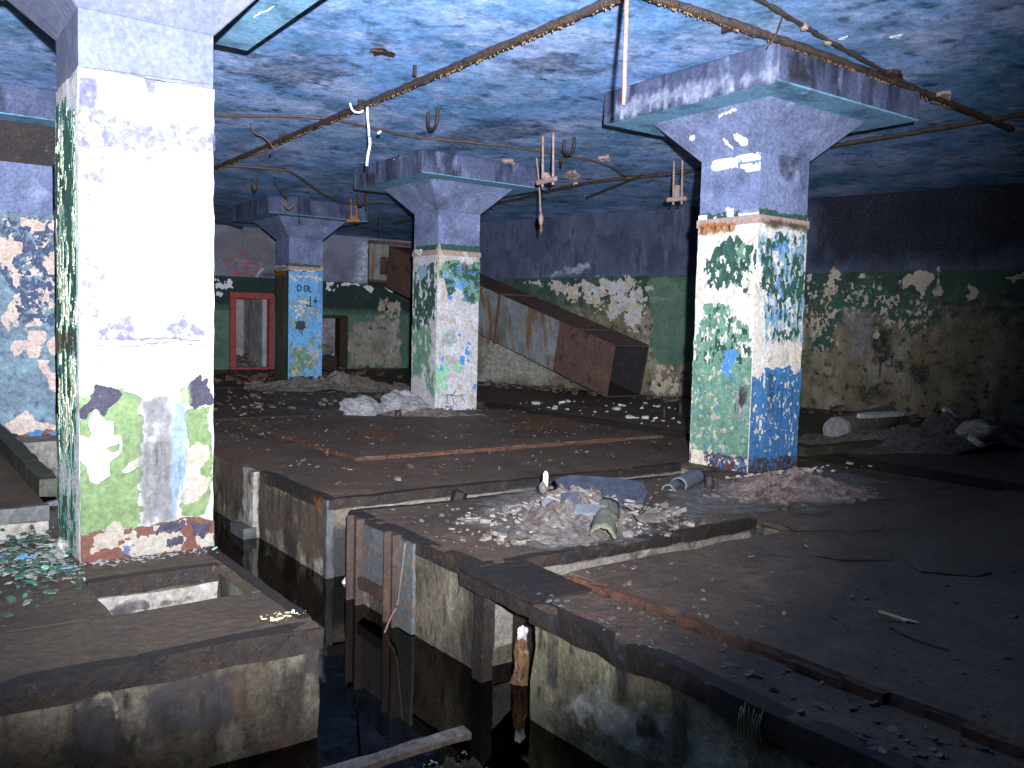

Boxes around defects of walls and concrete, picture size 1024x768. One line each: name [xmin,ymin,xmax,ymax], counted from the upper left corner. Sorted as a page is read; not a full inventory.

corrosion [699,222,735,235]
corrosion [766,220,807,233]
peeling [0,97,218,627]
flaking render [256,244,480,410]
corrosion [553,321,649,397]
peeling [524,207,943,473]
damp [846,311,894,367]
peeling [966,283,979,301]